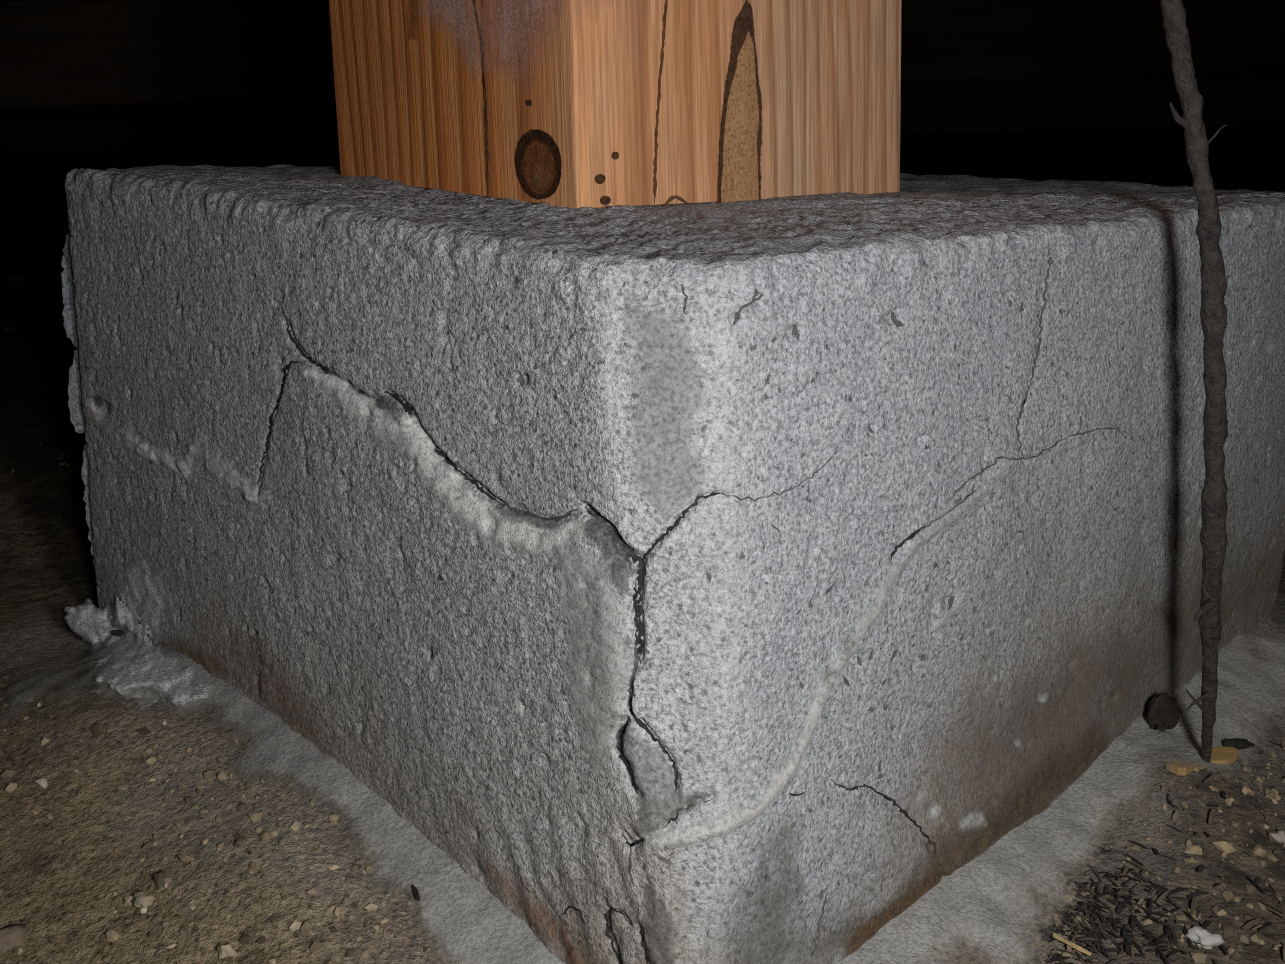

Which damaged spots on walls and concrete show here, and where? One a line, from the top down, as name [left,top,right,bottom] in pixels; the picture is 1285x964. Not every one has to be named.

crack [891,242,1130,560]
crack [257,284,839,964]
crack [789,780,937,857]